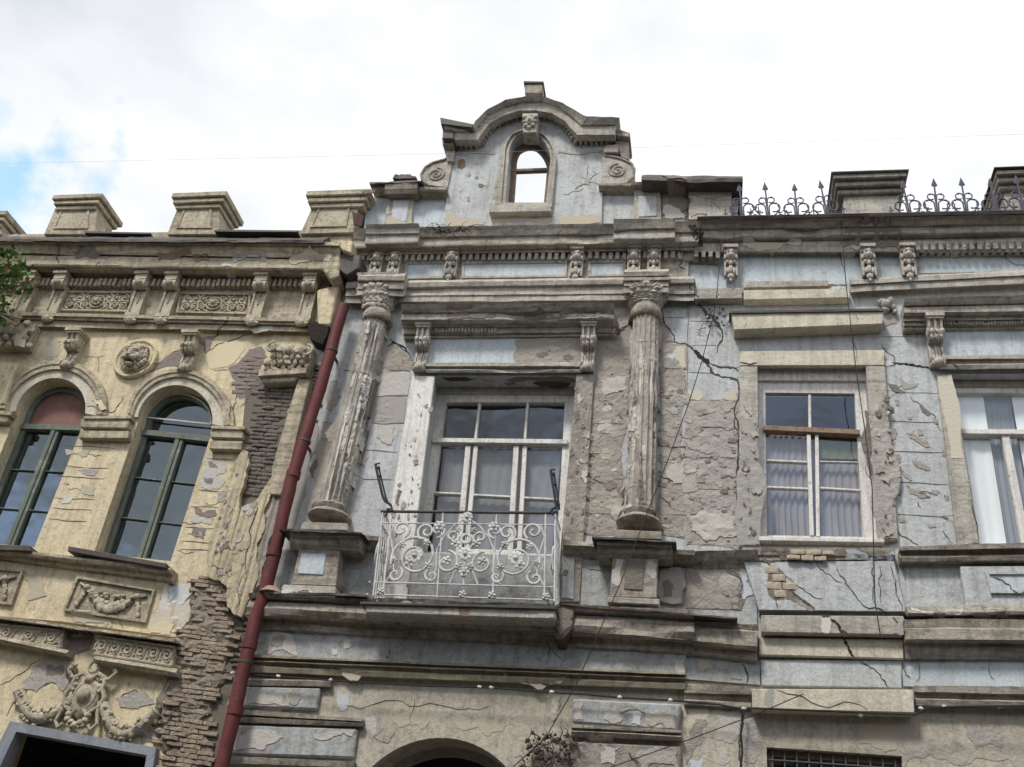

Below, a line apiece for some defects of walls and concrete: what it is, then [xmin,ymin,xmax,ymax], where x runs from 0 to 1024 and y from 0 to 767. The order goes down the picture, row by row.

flaking render [191,336,295,554]
spalling [352,321,428,582]
crack [660,180,757,509]
spalling [507,293,964,634]
crack [882,346,958,429]
flaking render [117,575,247,767]
peeling [233,727,283,751]
peeling [245,687,293,712]
spalling [281,585,315,597]
crack [346,700,486,743]
crack [778,690,868,710]
crack [762,560,920,687]